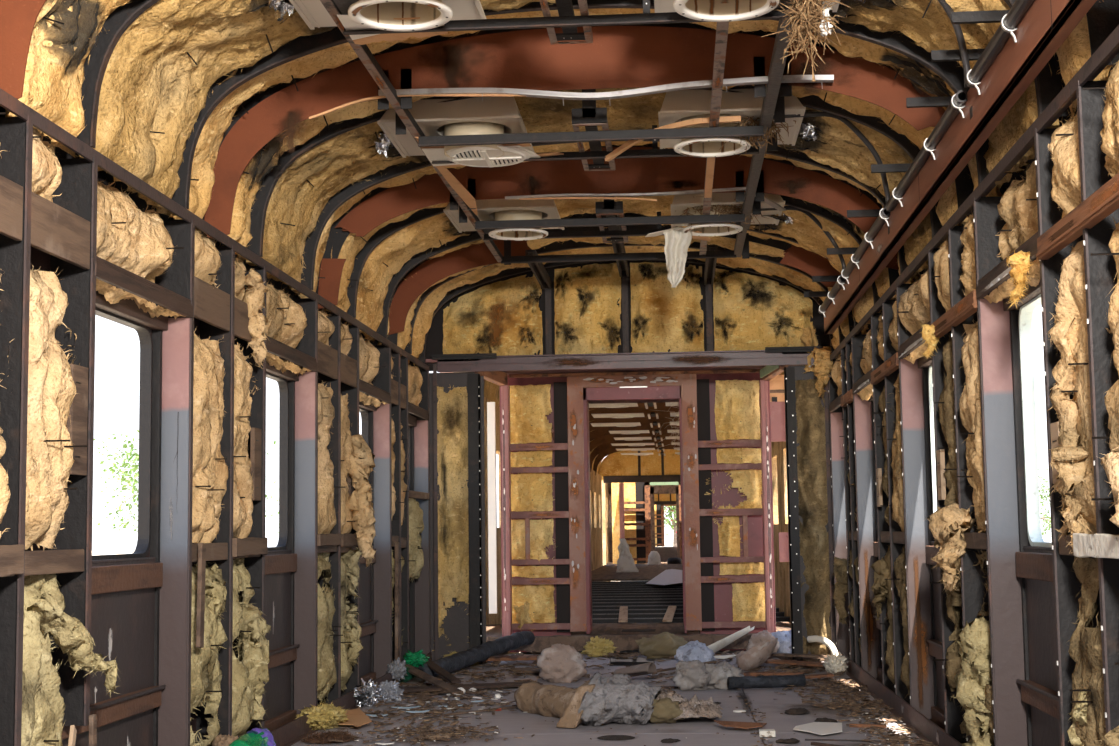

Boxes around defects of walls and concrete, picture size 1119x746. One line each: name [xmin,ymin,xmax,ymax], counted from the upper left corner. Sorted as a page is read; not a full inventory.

peeling [986,266,1012,289]
leakage [477,290,541,353]
peeling [854,337,923,392]